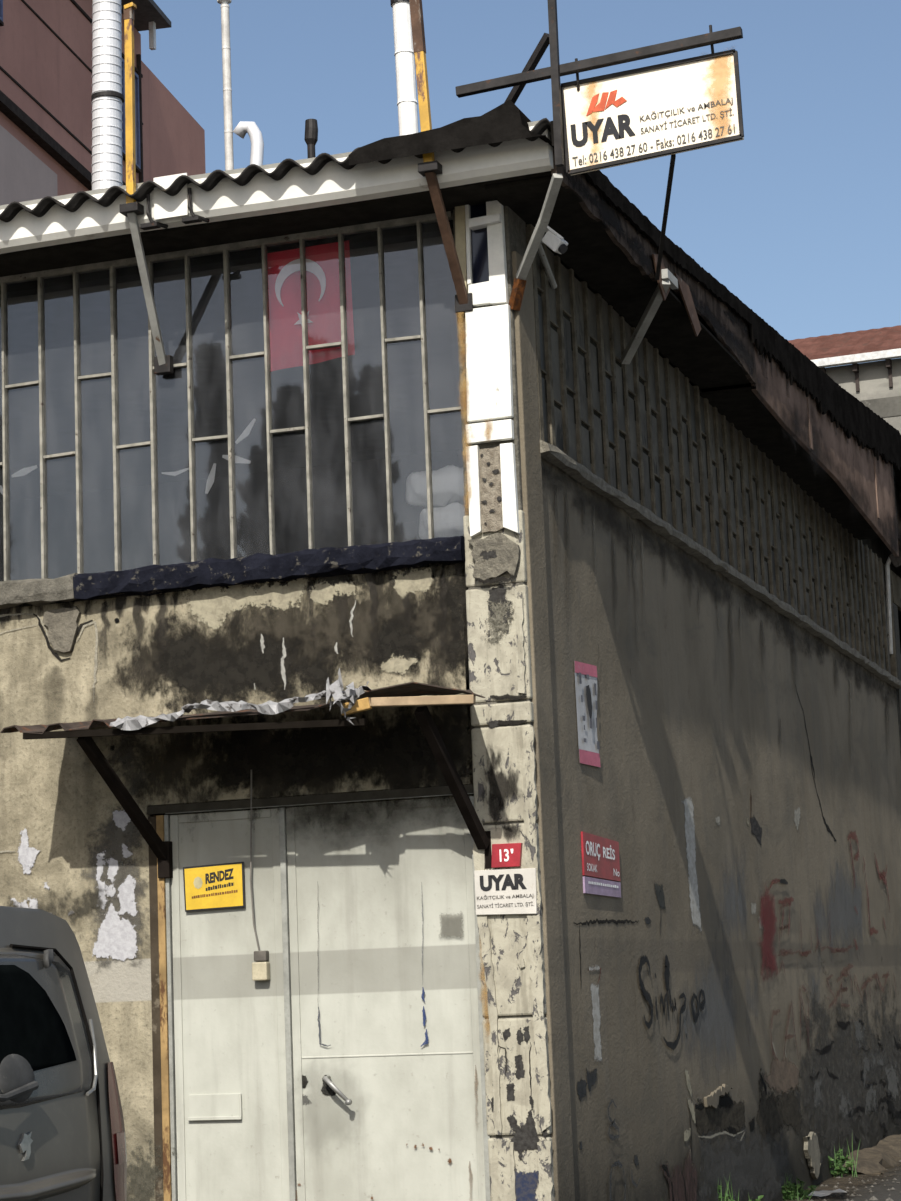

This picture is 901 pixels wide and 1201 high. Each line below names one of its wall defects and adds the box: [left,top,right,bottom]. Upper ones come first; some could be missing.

leakage [0,604,43,626]
leakage [58,561,518,840]
crack [796,689,837,842]
spalling [81,808,148,966]
spalling [491,1026,548,1201]
spalling [683,972,901,1201]